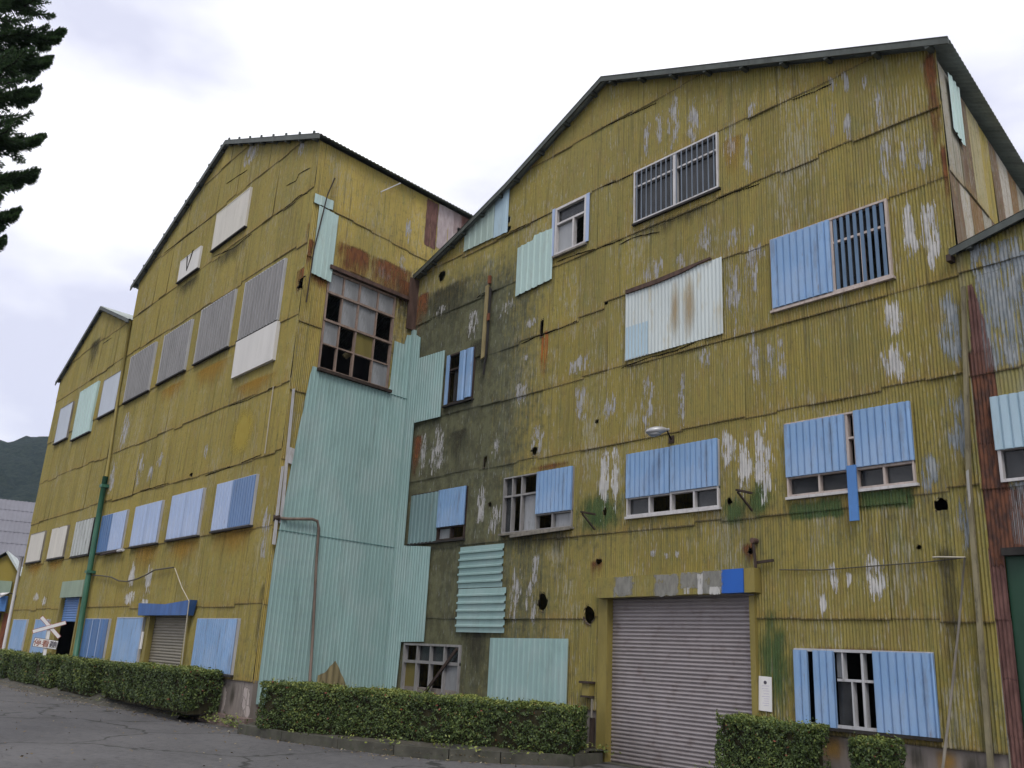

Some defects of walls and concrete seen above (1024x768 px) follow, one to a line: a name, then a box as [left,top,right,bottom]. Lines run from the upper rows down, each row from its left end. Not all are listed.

corrosion [923,54,939,128]
corrosion [941,146,950,192]
peeling [902,194,942,271]
corrosion [339,244,428,324]
peeling [880,300,911,384]
peeling [419,424,444,476]
peeling [599,446,619,521]
peeling [721,417,776,506]
corrosion [967,284,1024,768]
peeling [510,549,539,623]
peeling [819,562,851,617]
peeling [864,551,886,602]